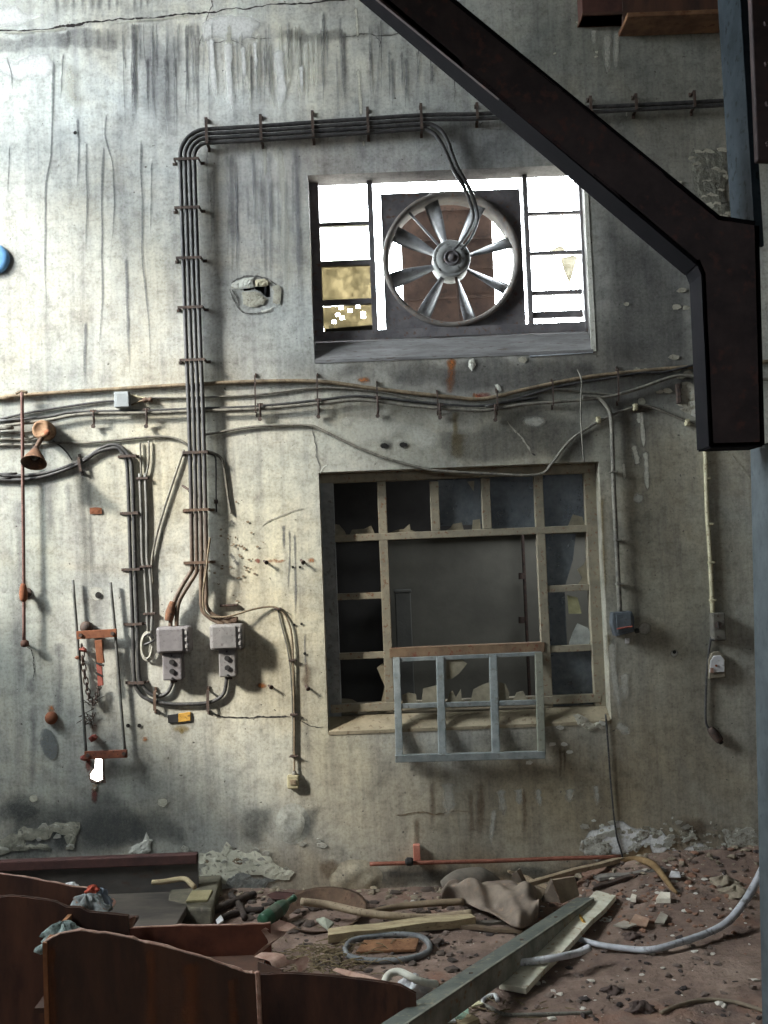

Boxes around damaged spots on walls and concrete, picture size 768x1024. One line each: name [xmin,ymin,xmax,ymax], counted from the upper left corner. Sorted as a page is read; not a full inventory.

crack [0,0,345,46]
leakage [131,14,328,107]
leakage [342,30,433,114]
flaking render [677,147,731,217]
spalling [230,275,281,315]
flaking render [0,822,80,855]
flaking render [128,832,153,854]
flaking render [180,842,294,889]
peeling [579,817,759,862]